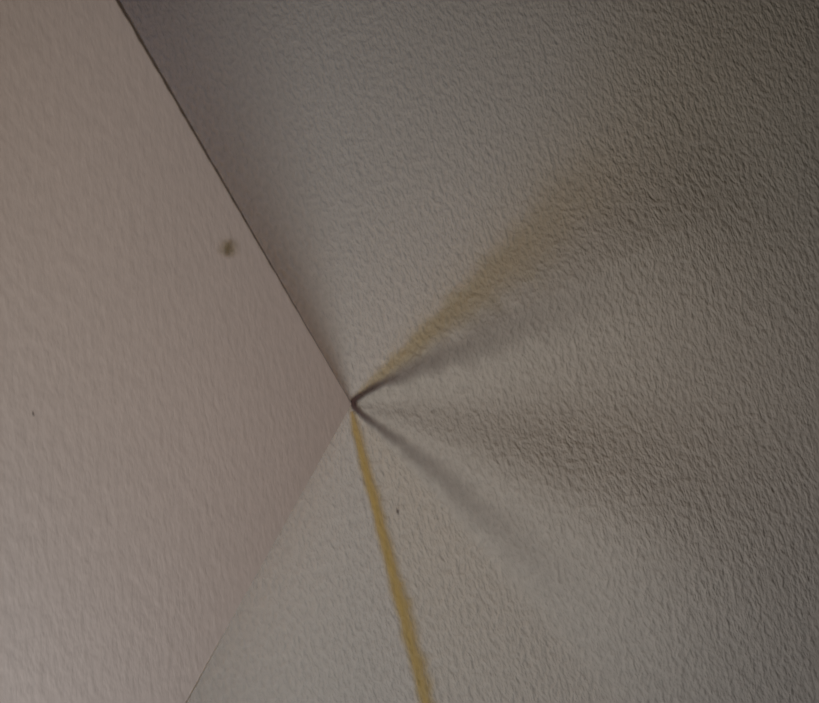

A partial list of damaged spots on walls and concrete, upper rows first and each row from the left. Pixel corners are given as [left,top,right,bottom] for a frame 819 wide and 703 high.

leakage [353,417,429,703]